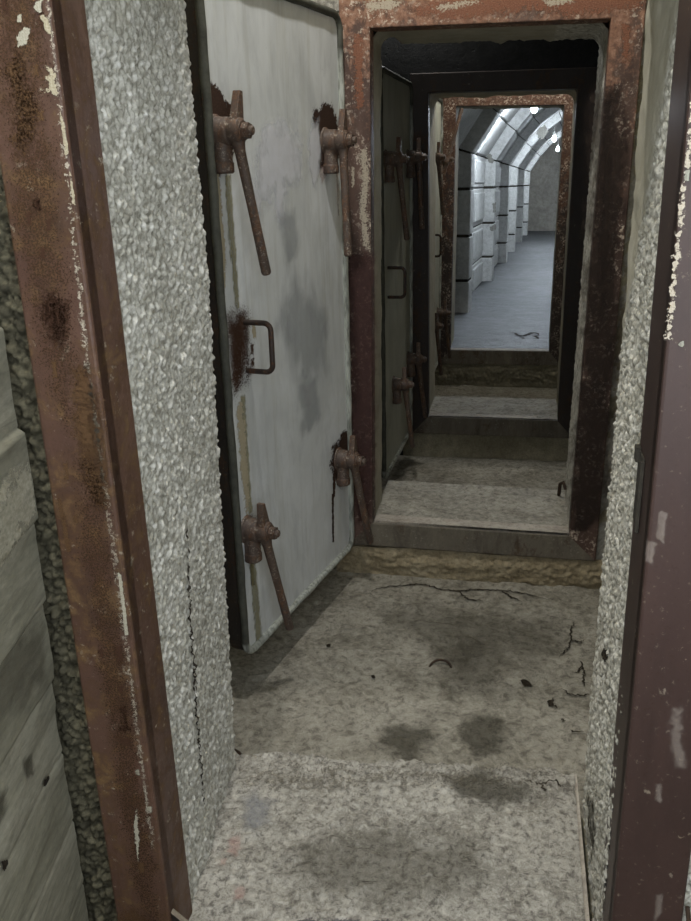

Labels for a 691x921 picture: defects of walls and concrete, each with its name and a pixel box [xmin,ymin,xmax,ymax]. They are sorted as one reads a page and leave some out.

peeling [16,14,30,48]
peeling [34,0,51,34]
rust [408,0,644,64]
peeling [40,65,58,96]
peeling [60,112,69,155]
rust [570,88,628,531]
rust [0,0,169,921]
crack [372,583,553,602]
crack [550,622,589,732]
water stain [381,727,427,758]
water stain [462,716,501,755]
water stain [452,772,526,802]